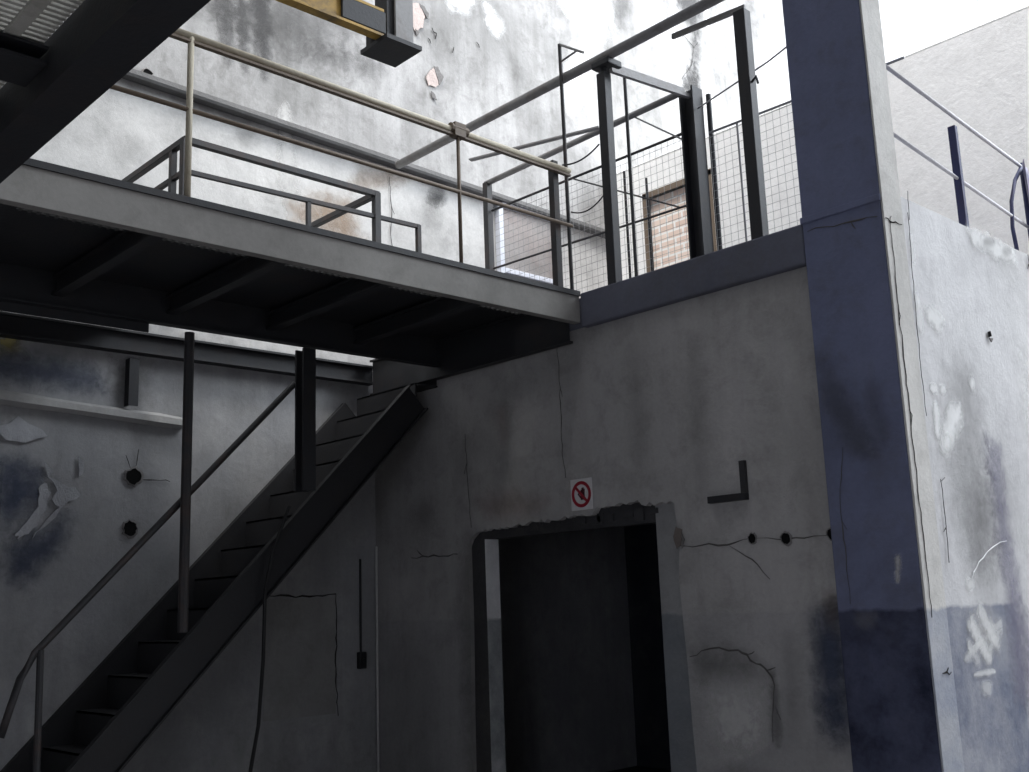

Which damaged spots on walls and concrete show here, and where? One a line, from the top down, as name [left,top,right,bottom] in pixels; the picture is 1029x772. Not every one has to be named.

leakage [218,0,270,72]
spalling [413,3,429,36]
spalling [426,66,444,100]
leakage [678,0,714,104]
peeling [0,416,47,443]
peeling [930,384,962,455]
leakage [0,462,40,518]
peeling [15,456,84,539]
crack [681,450,851,604]
peeling [966,605,999,676]
crack [690,647,781,741]